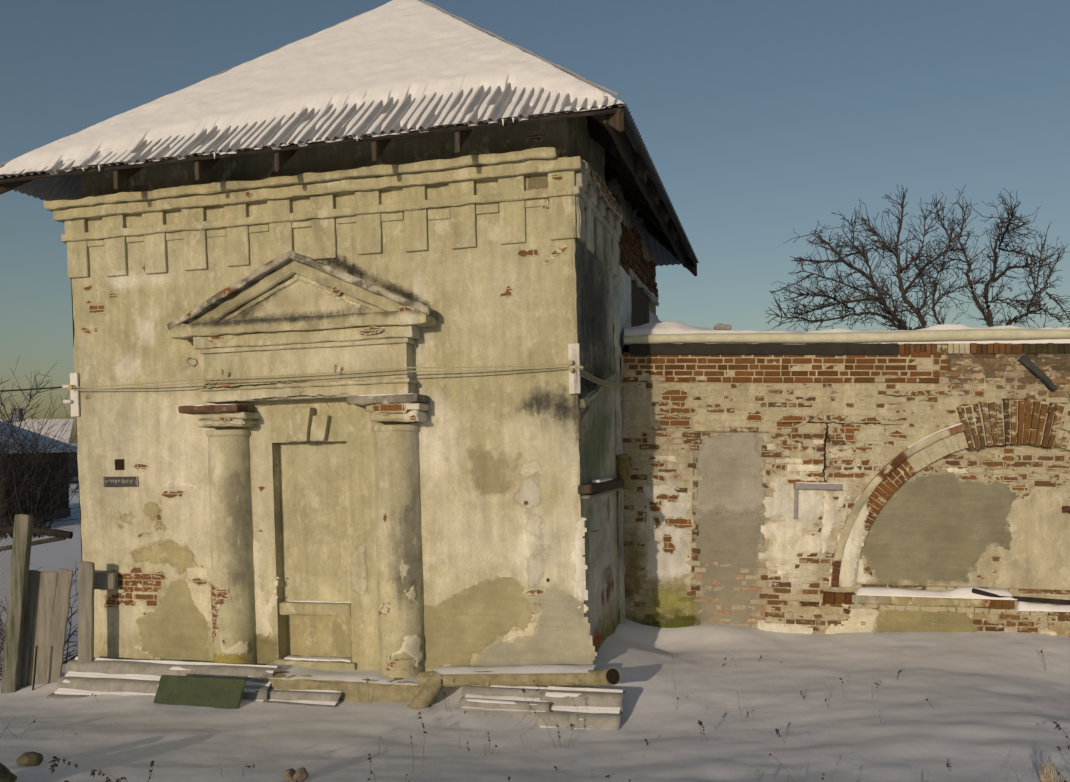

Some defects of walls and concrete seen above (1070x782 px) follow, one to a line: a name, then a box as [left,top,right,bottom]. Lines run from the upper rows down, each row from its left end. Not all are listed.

flaking render [103,478,279,655]
peeling [643,459,696,581]
peeling [744,409,909,587]
crack [773,411,904,482]
spalling [758,604,1070,636]
flaking render [900,387,986,418]
peeling [948,458,1070,590]